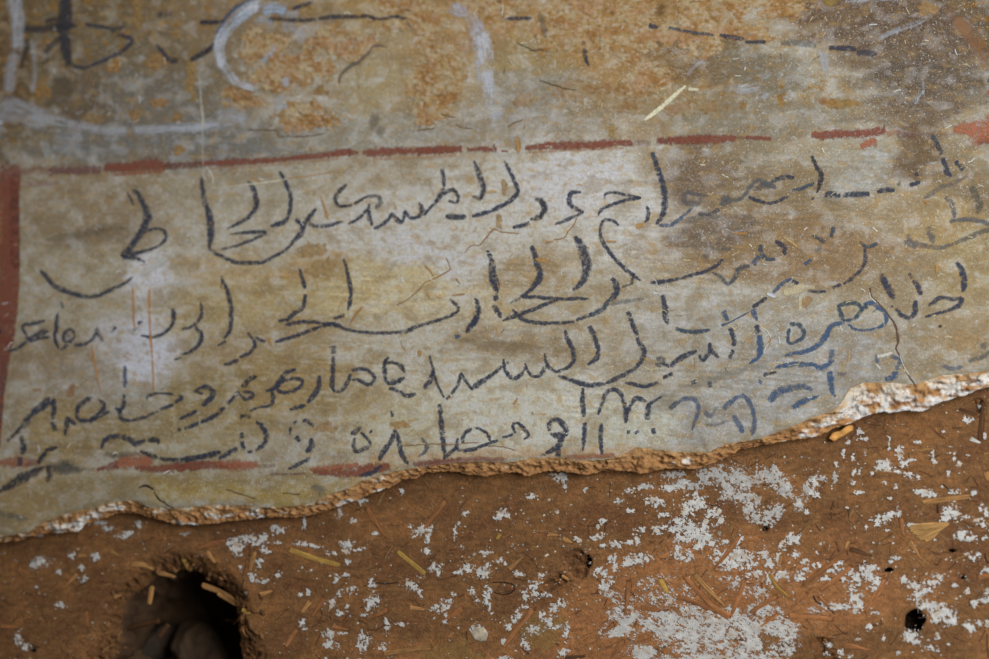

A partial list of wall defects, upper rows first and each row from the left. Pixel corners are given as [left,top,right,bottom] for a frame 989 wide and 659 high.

spalling [186,0,528,134]
spalling [531,0,838,101]
peeling [819,97,860,109]
peeling [297,240,335,280]
spalling [0,371,989,641]
peeling [320,618,409,659]
peeling [430,550,580,659]
peeling [896,573,989,655]